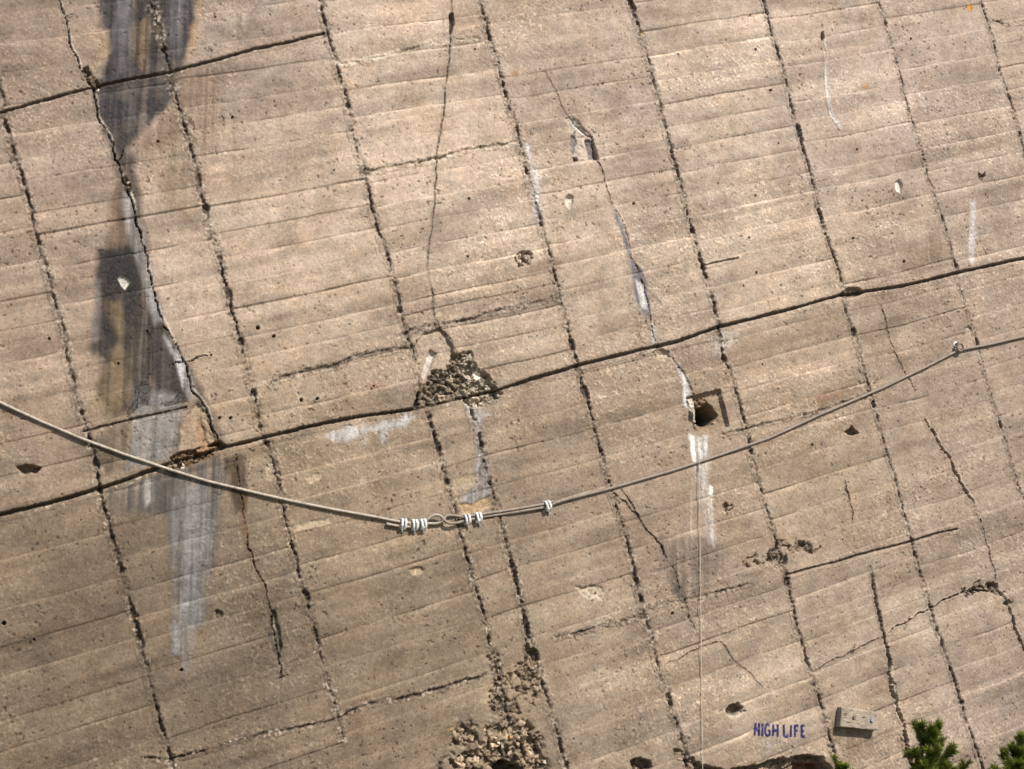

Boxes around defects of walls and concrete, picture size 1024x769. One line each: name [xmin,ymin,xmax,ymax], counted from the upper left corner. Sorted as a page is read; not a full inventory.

water stain [80,0,252,478]
crack [0,0,764,769]
spalling [416,330,504,408]
crack [625,0,1024,769]
water stain [108,451,250,679]
water stain [644,433,731,611]
spalling [434,715,552,769]